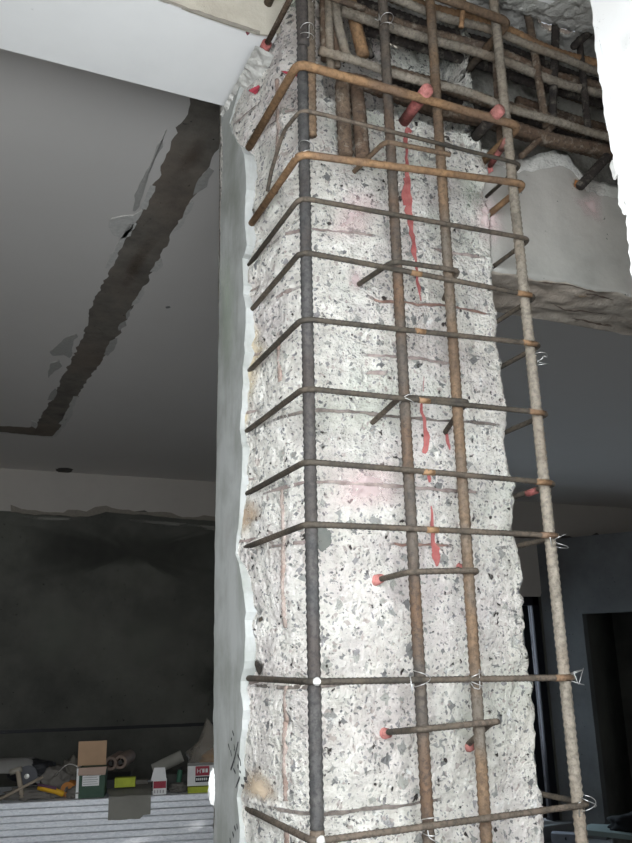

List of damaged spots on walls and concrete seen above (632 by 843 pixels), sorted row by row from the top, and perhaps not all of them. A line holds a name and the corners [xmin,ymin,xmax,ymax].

flaking render [160,0,285,36]
spalling [466,0,597,59]
flaking render [610,160,627,215]
peeling [0,46,274,438]
flaking render [318,528,332,552]